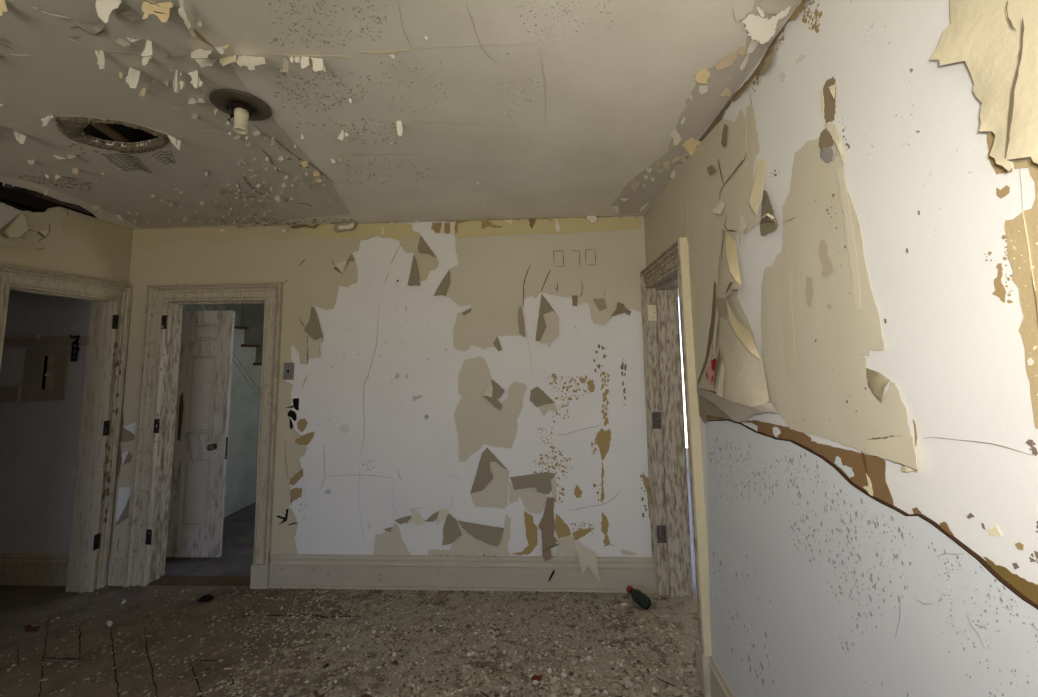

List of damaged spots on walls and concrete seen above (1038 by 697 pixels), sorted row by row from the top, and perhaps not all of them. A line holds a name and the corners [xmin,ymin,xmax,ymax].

peeling [95,0,121,23]
spalling [41,115,181,153]
peeling [163,19,266,120]
spalling [611,0,801,219]
spalling [818,77,845,164]
spalling [987,133,1038,429]
spalling [286,398,314,446]
crack [319,314,401,546]
spalling [555,428,611,546]
mould [707,437,913,654]
spalling [706,415,1038,610]
leakage [928,542,1038,697]